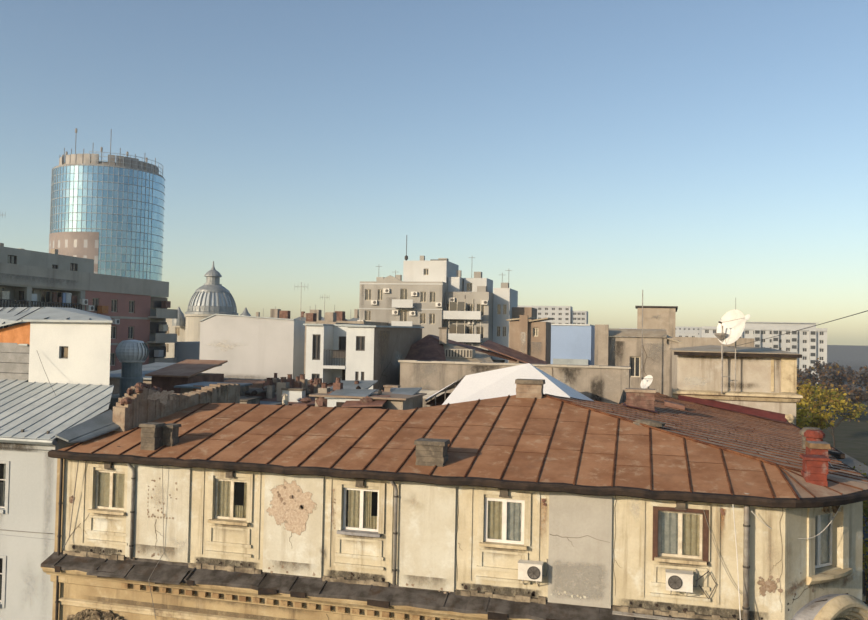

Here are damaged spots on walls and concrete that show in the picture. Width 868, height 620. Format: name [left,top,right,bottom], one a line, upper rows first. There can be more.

flaking render [266,479,317,546]
crack [550,496,621,592]
flaking render [757,572,814,611]